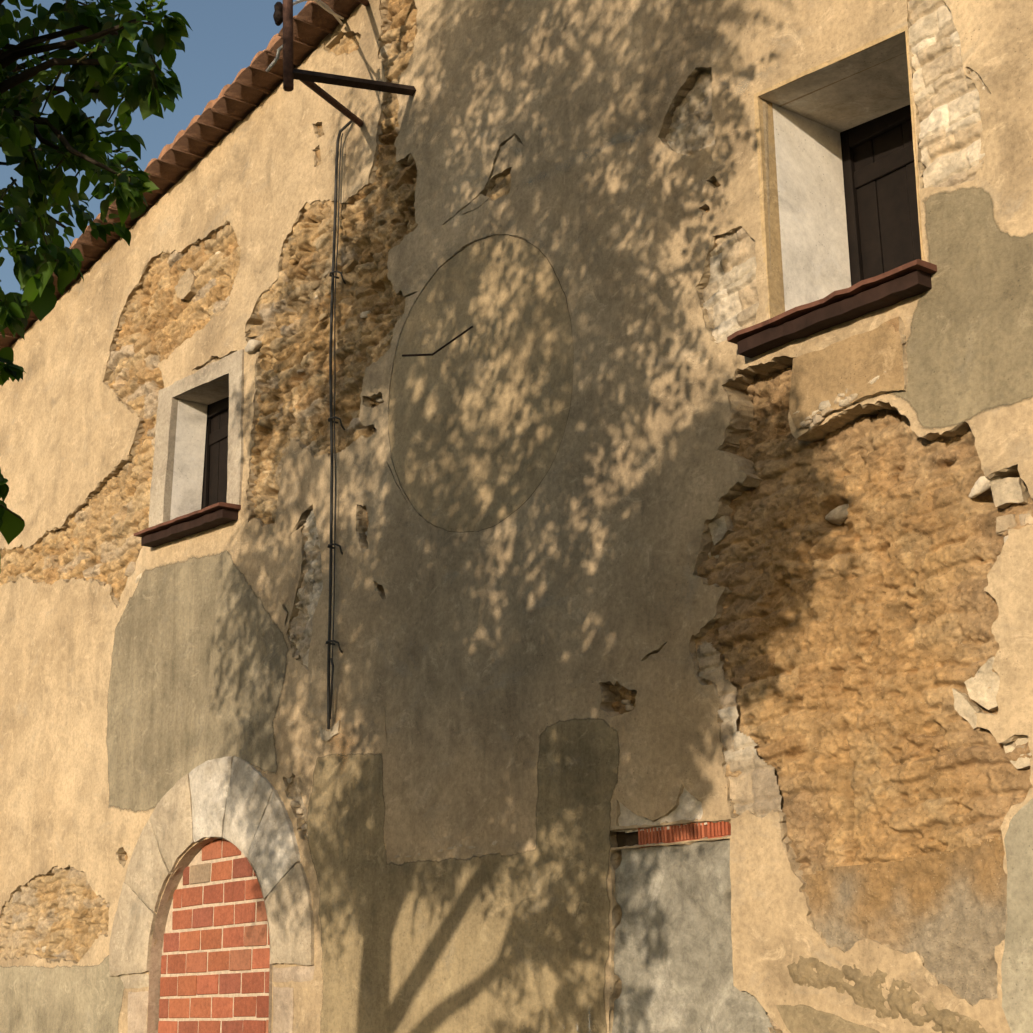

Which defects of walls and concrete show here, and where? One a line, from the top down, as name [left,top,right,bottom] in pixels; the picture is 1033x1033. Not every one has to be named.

flaking render [665,70,715,156]
flaking render [907,0,985,188]
flaking render [245,0,418,526]
flaking render [703,228,759,343]
flaking render [0,224,241,603]
flaking render [289,510,323,667]
flaking render [609,684,637,714]
flaking render [695,366,1033,1033]
flaking render [0,866,110,962]